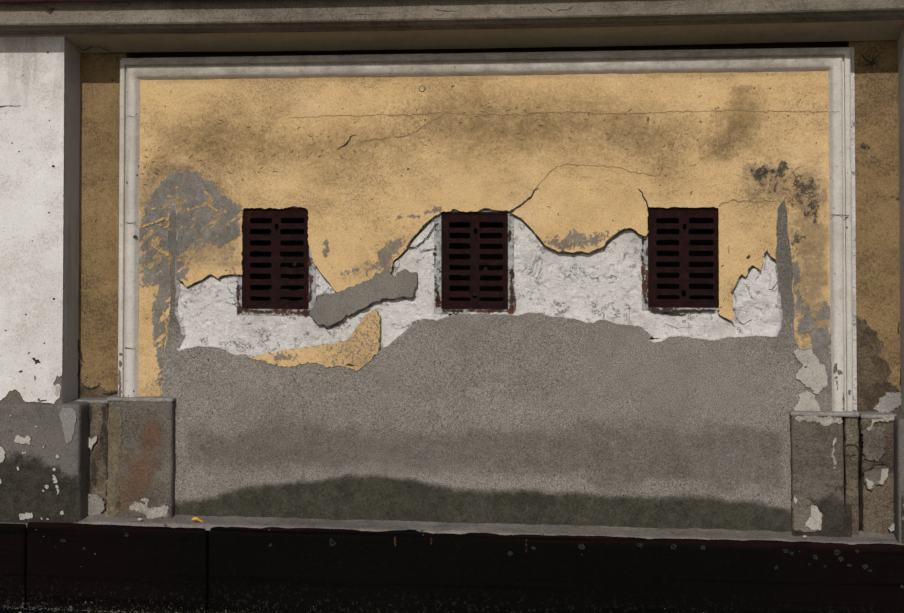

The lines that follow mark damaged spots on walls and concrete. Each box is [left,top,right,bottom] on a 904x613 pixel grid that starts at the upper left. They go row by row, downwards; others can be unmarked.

crack [143,104,838,213]
leakage [789,167,819,223]
corrosion [236,257,314,317]
spalling [133,171,449,396]
corrosion [433,249,517,314]
spalling [510,215,781,340]
corrosion [640,236,676,311]
peeling [792,255,901,412]
spalling [0,375,77,444]
peeling [78,347,126,518]
leakage [129,407,791,532]
spalling [792,492,823,532]